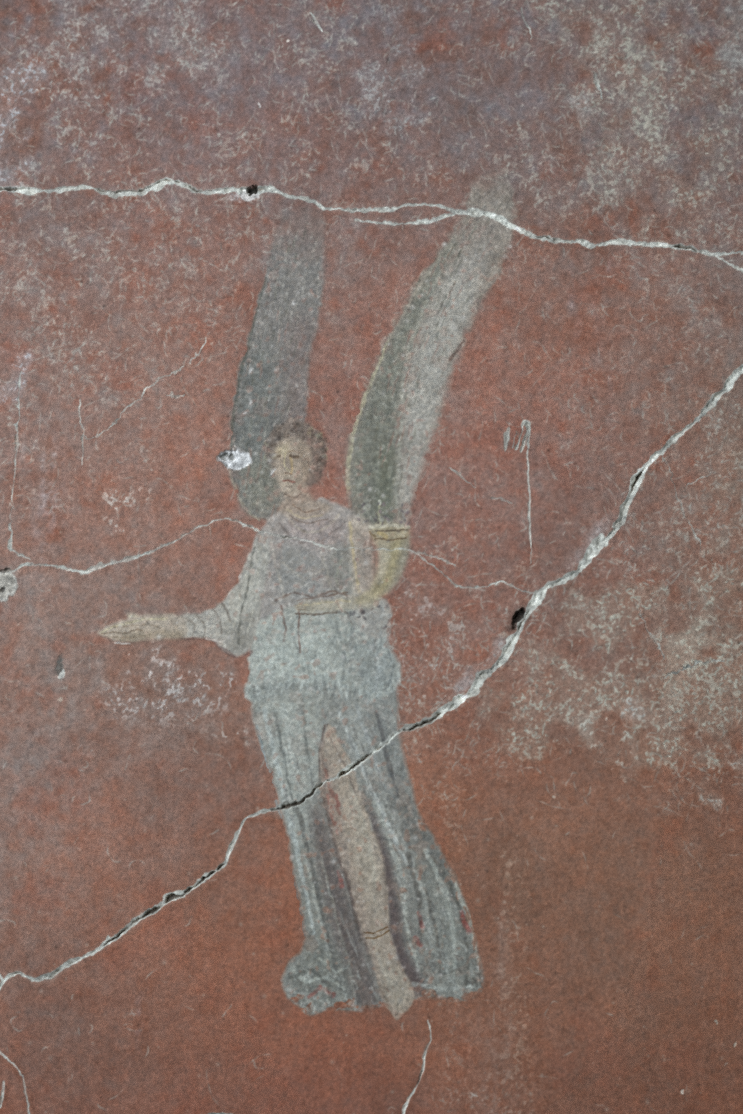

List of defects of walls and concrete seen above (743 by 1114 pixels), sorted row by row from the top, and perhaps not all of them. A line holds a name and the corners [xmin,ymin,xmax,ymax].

crack [0,170,743,282]
flaking render [216,444,253,471]
crack [0,336,743,1003]
crack [0,1044,35,1114]
crack [397,1016,437,1114]